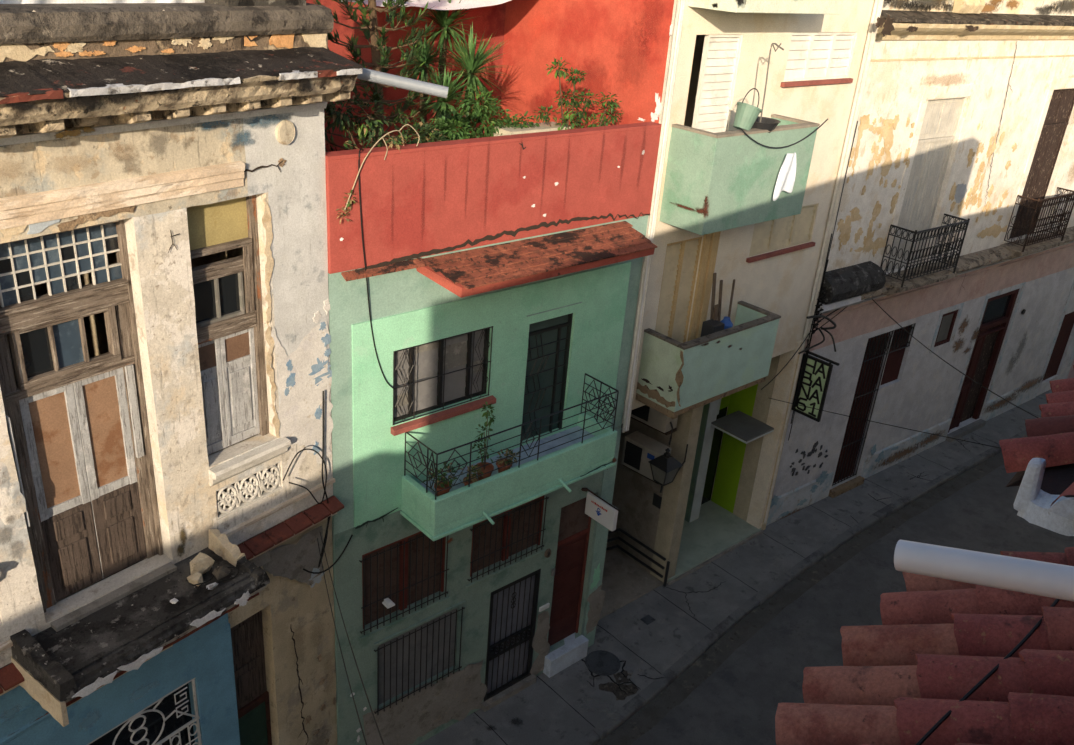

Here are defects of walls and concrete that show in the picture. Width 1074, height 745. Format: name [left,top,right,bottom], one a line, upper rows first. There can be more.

mould [884,0,954,12]
leakage [981,0,1020,13]
leakage [1036,0,1074,15]
flaking render [0,40,146,62]
flaking render [161,33,327,53]
peeling [837,114,915,257]
peeling [949,132,1017,238]
corrosion [671,197,709,217]
peeling [262,197,333,464]
peeling [190,591,250,628]
peeling [72,646,163,698]
crack [290,626,308,745]